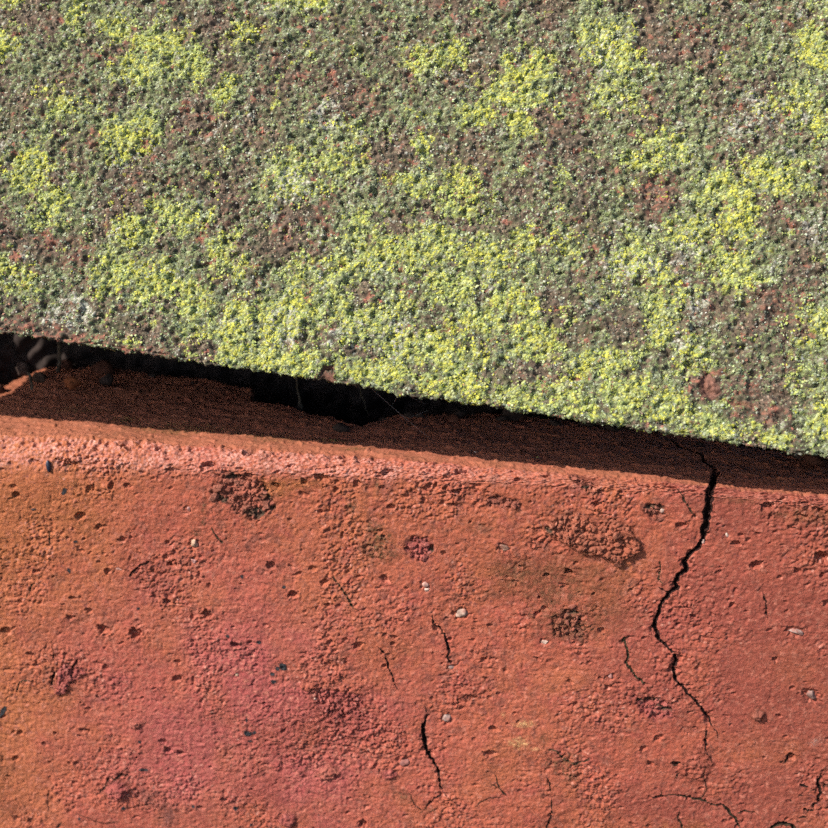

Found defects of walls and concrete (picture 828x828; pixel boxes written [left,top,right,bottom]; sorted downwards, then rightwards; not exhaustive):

spalling [209,472,276,521]
crack [432,616,454,663]
crack [621,637,645,684]
crack [652,436,754,828]
crack [409,706,506,810]
crack [771,773,828,828]